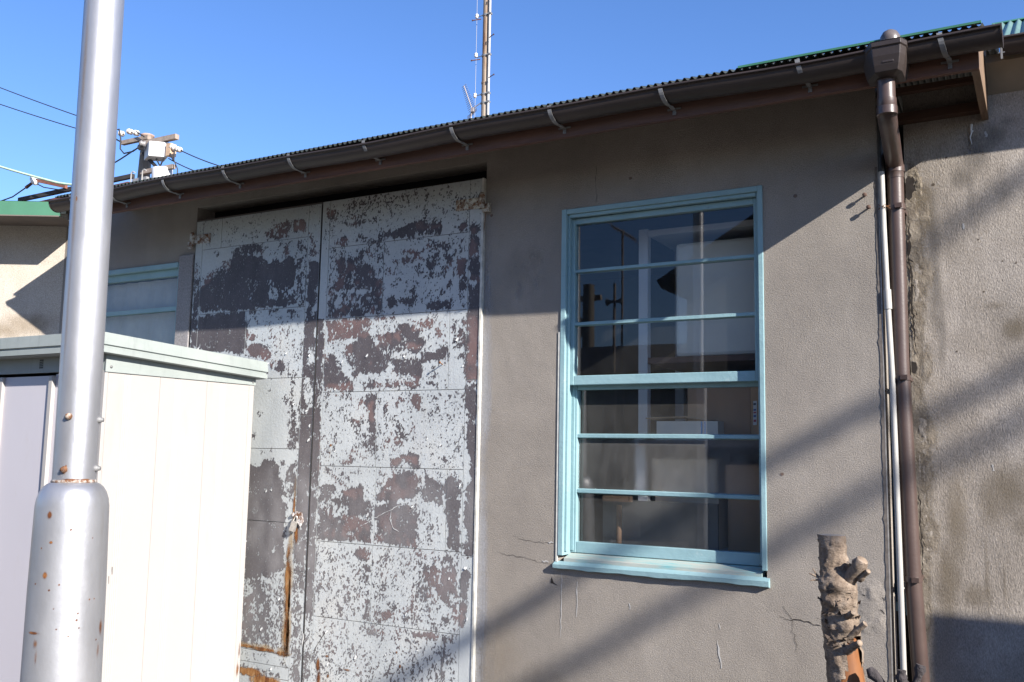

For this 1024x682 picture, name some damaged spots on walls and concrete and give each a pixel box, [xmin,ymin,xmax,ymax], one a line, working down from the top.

corrosion [236,496,298,682]
peeling [190,182,493,682]